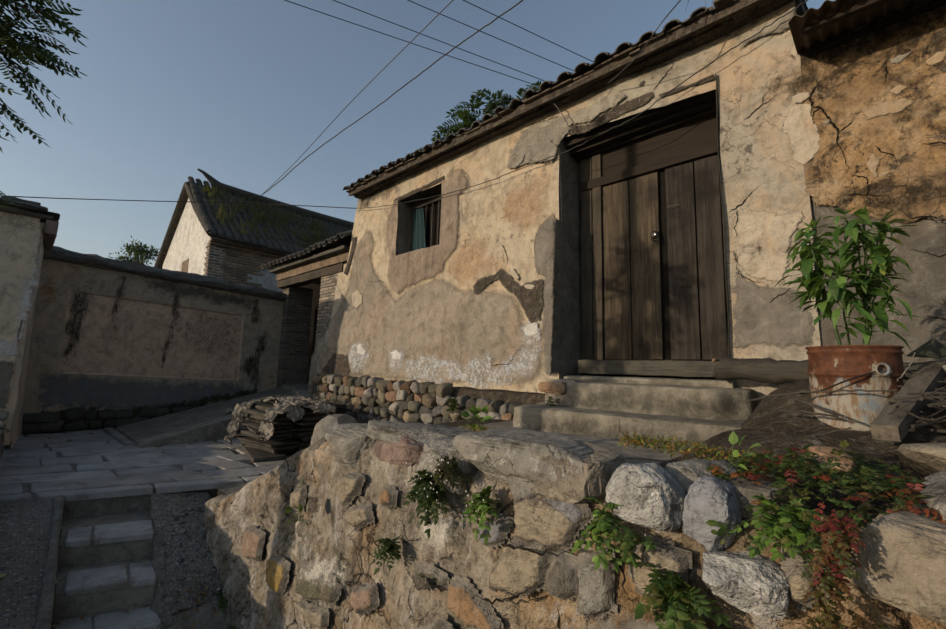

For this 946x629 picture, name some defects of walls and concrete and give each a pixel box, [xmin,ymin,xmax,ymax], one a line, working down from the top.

crack [809,80,884,205]
leakage [64,286,88,356]
leakage [39,336,266,410]
leakage [149,281,260,365]
leakage [348,342,369,373]
spalling [315,215,592,383]
leakage [388,321,541,388]
crack [501,543,558,556]
crack [476,577,532,629]